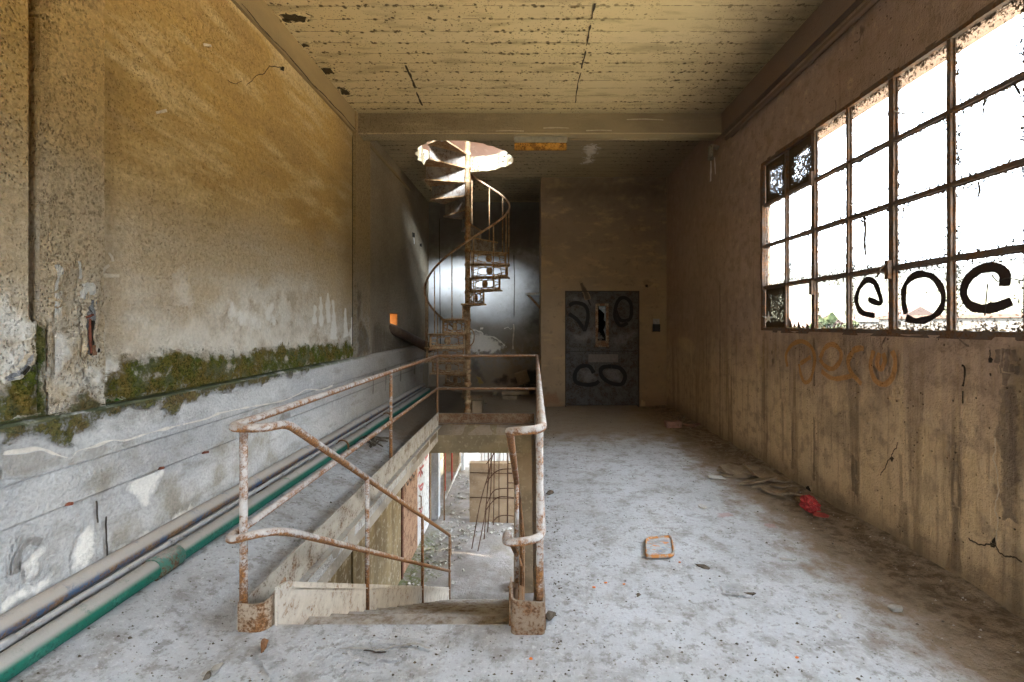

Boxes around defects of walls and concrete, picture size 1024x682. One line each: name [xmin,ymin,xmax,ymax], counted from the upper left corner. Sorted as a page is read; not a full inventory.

spalling [275,10,314,25]
crack [405,65,423,106]
crack [575,3,597,103]
leakage [105,121,426,381]
spalling [48,260,101,362]
spalling [0,349,38,384]
leakage [0,385,333,480]
crack [880,442,898,476]
leakage [767,348,1024,620]
crack [968,438,1023,563]